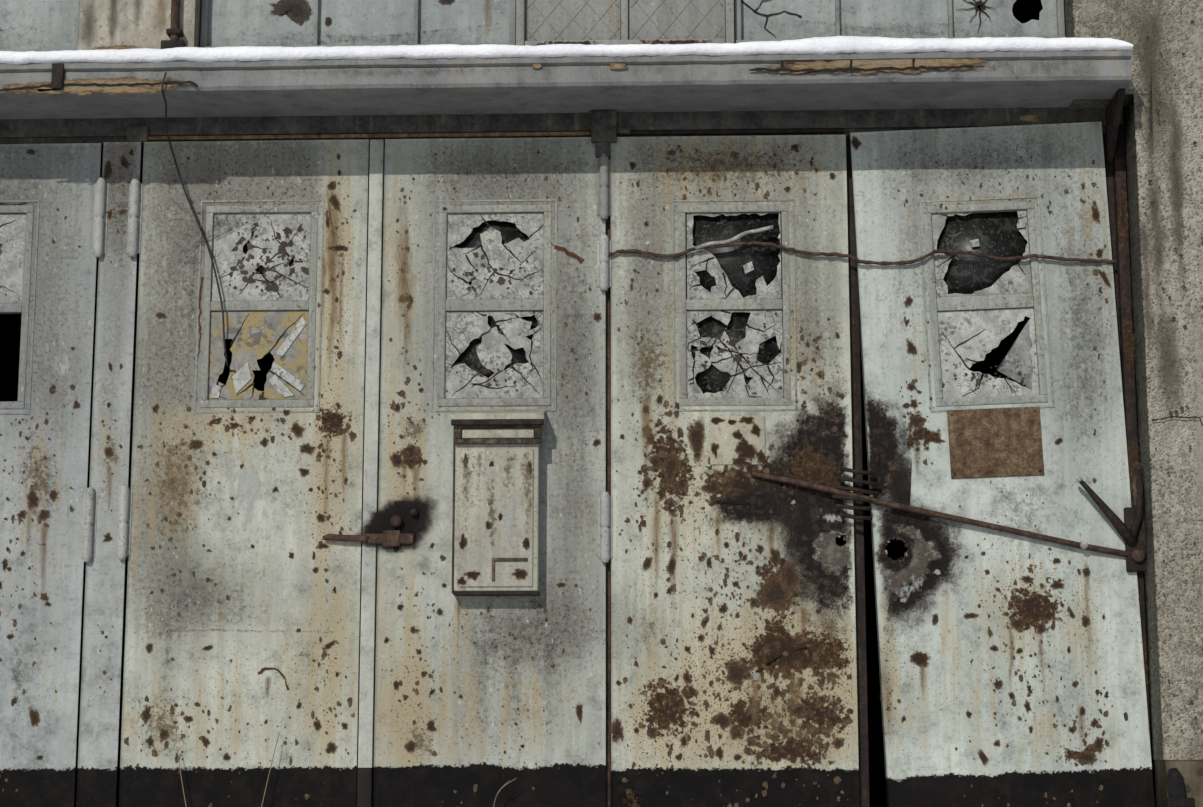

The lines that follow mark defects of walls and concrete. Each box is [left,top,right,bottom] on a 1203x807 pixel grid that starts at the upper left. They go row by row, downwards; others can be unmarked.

crack [741,0,802,37]
crack [956,0,992,30]
peeling [749,58,1000,75]
peeling [0,76,198,96]